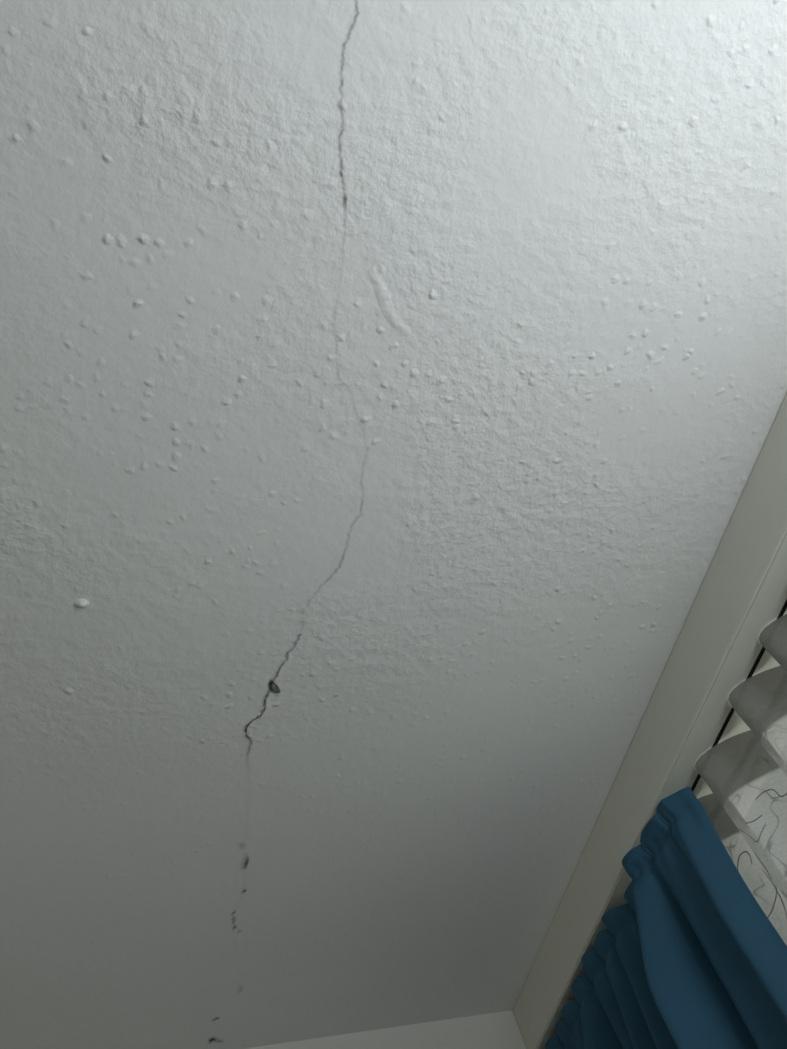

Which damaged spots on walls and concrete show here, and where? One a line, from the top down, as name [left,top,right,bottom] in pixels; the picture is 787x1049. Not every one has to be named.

crack [244,653,293,740]